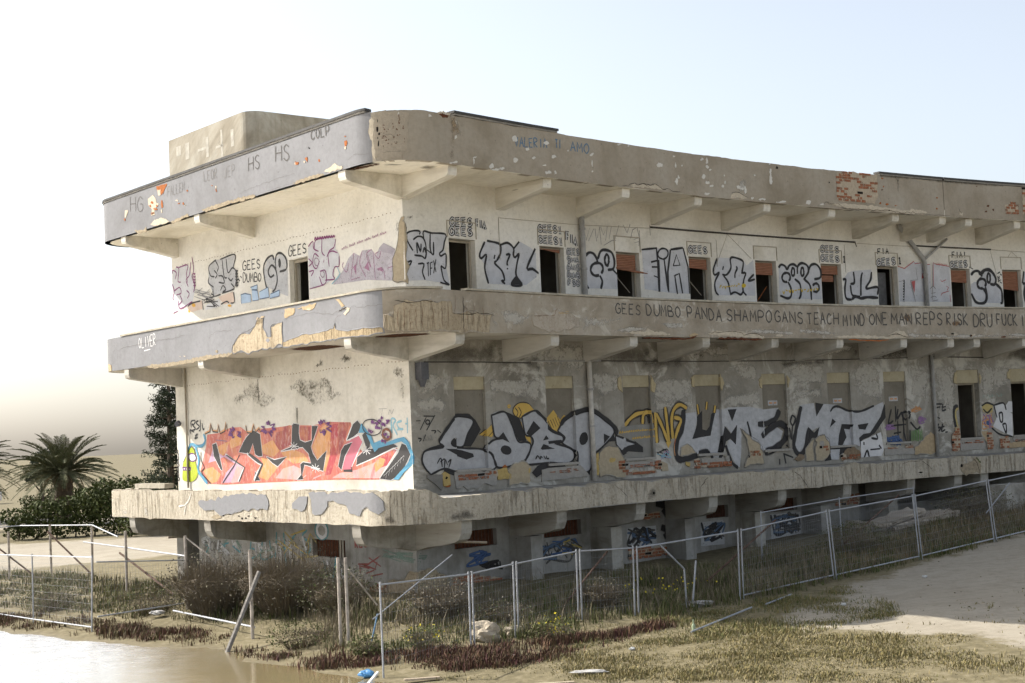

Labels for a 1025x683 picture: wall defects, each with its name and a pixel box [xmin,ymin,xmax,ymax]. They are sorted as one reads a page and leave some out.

spalling [293,148,343,185]
spalling [134,190,189,234]
spalling [806,171,945,216]
spalling [392,216,411,284]
spalling [147,296,529,369]
spalling [619,323,830,357]
peeling [417,374,446,411]
peeling [490,379,541,399]
peeling [650,375,695,409]